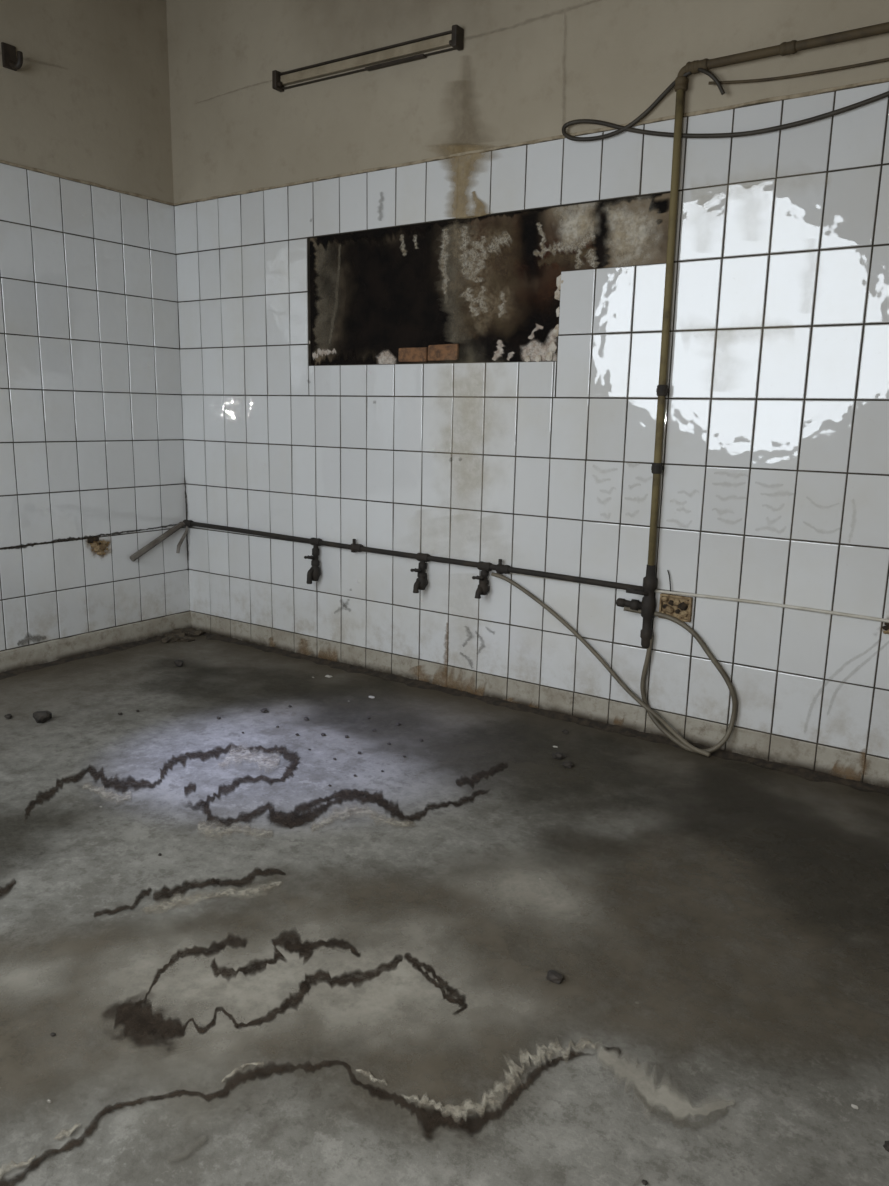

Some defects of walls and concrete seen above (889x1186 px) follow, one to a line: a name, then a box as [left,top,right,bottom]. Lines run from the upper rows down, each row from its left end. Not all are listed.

water stain [443,144,487,218]
spalling [309,193,670,365]
spalling [87,537,110,557]
crack [25,744,508,837]
crack [94,868,285,917]